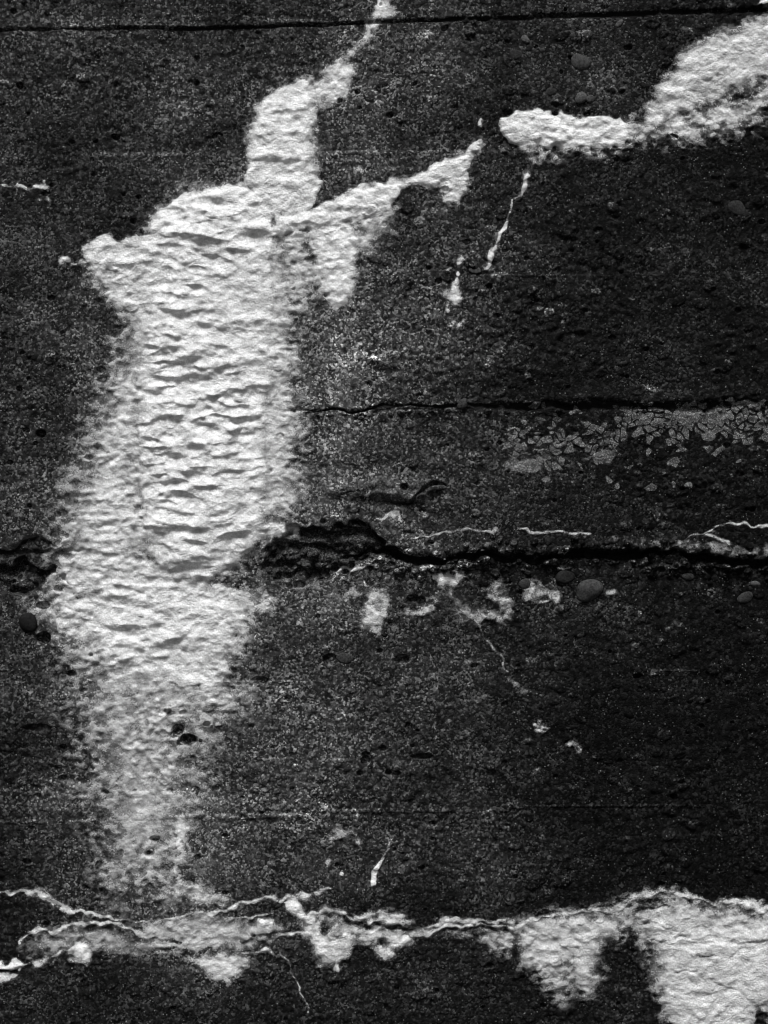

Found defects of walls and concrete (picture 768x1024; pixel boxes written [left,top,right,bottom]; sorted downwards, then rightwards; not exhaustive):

crack [293,398,768,414]
peeling [501,397,768,491]
crack [0,533,72,556]
crack [350,520,768,576]